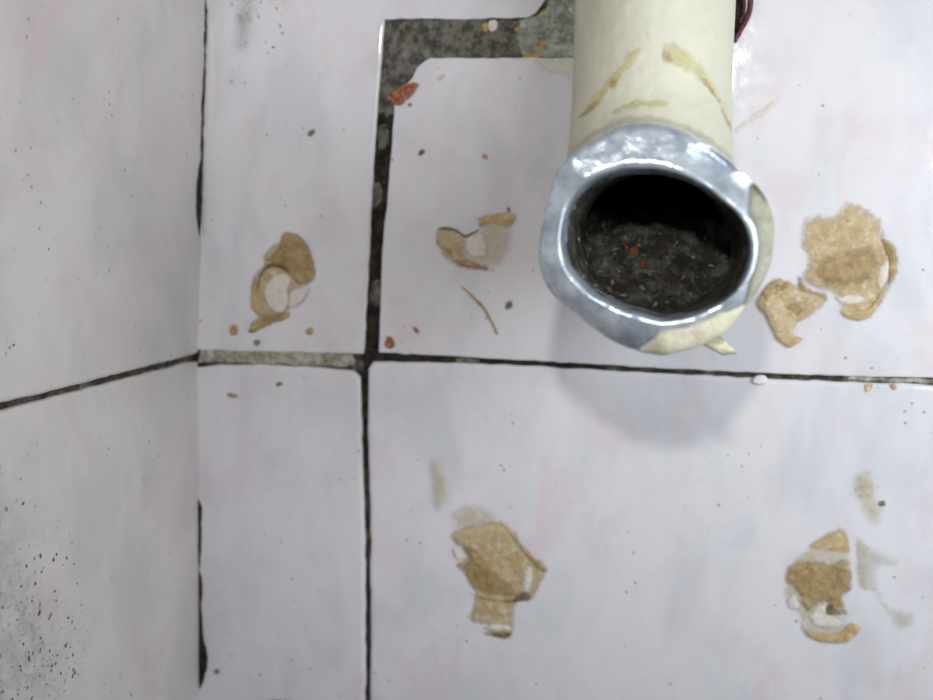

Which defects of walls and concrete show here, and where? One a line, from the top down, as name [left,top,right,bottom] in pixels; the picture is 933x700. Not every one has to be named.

peeling [248,233,315,333]
peeling [437,207,515,269]
peeling [462,287,498,334]
peeling [758,205,897,347]
peeling [453,522,547,638]
peeling [787,530,860,643]